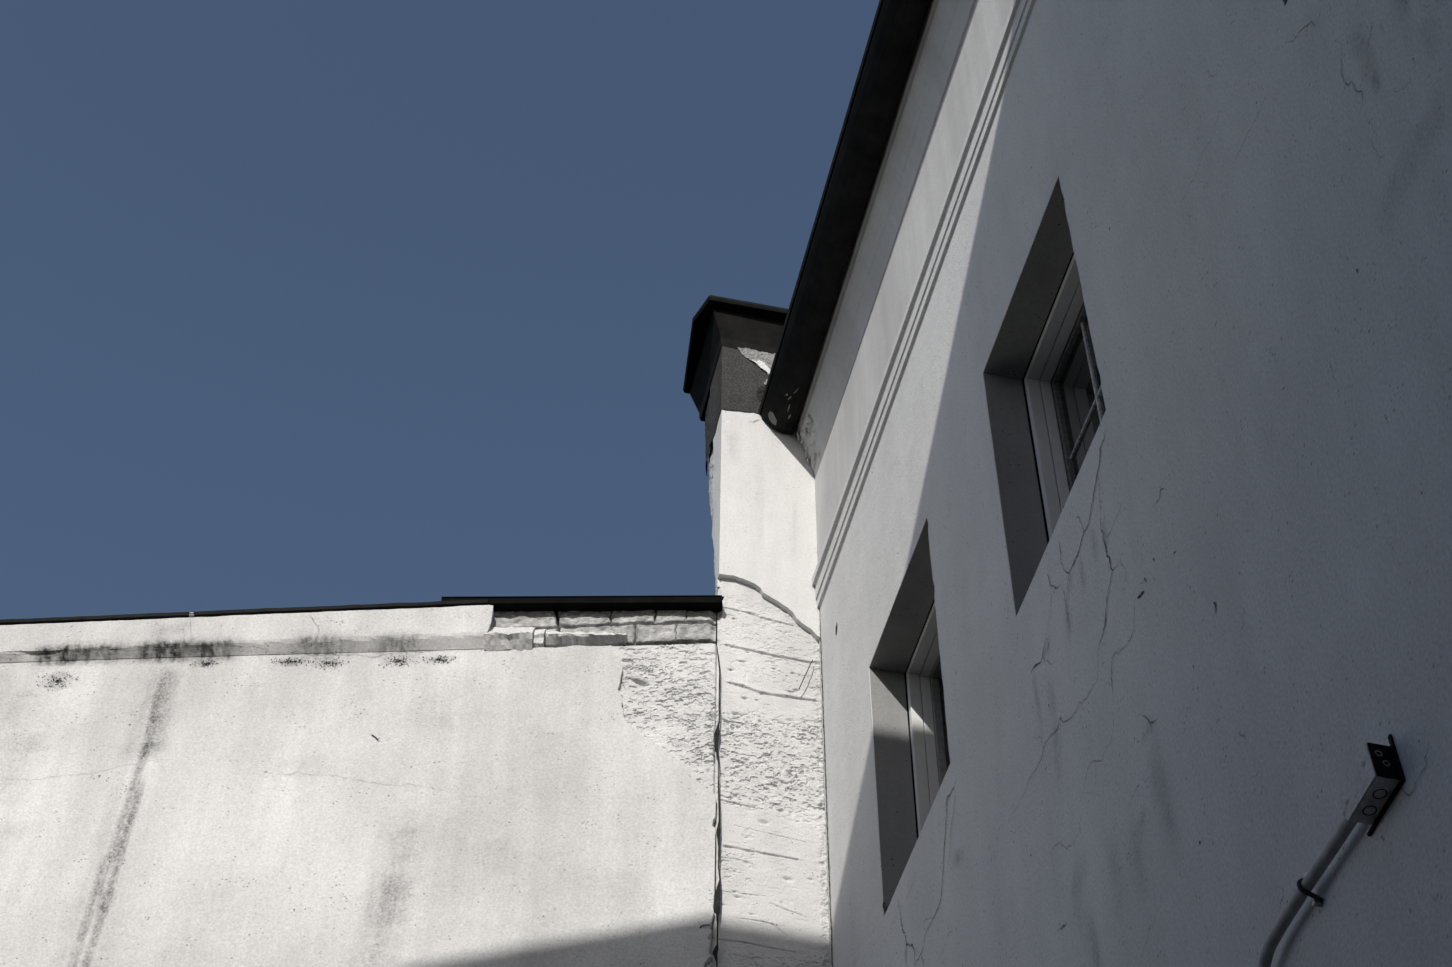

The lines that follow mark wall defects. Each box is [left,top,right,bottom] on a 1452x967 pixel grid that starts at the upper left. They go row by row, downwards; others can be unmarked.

spalling [611,579,830,967]
crack [1018,440,1147,805]